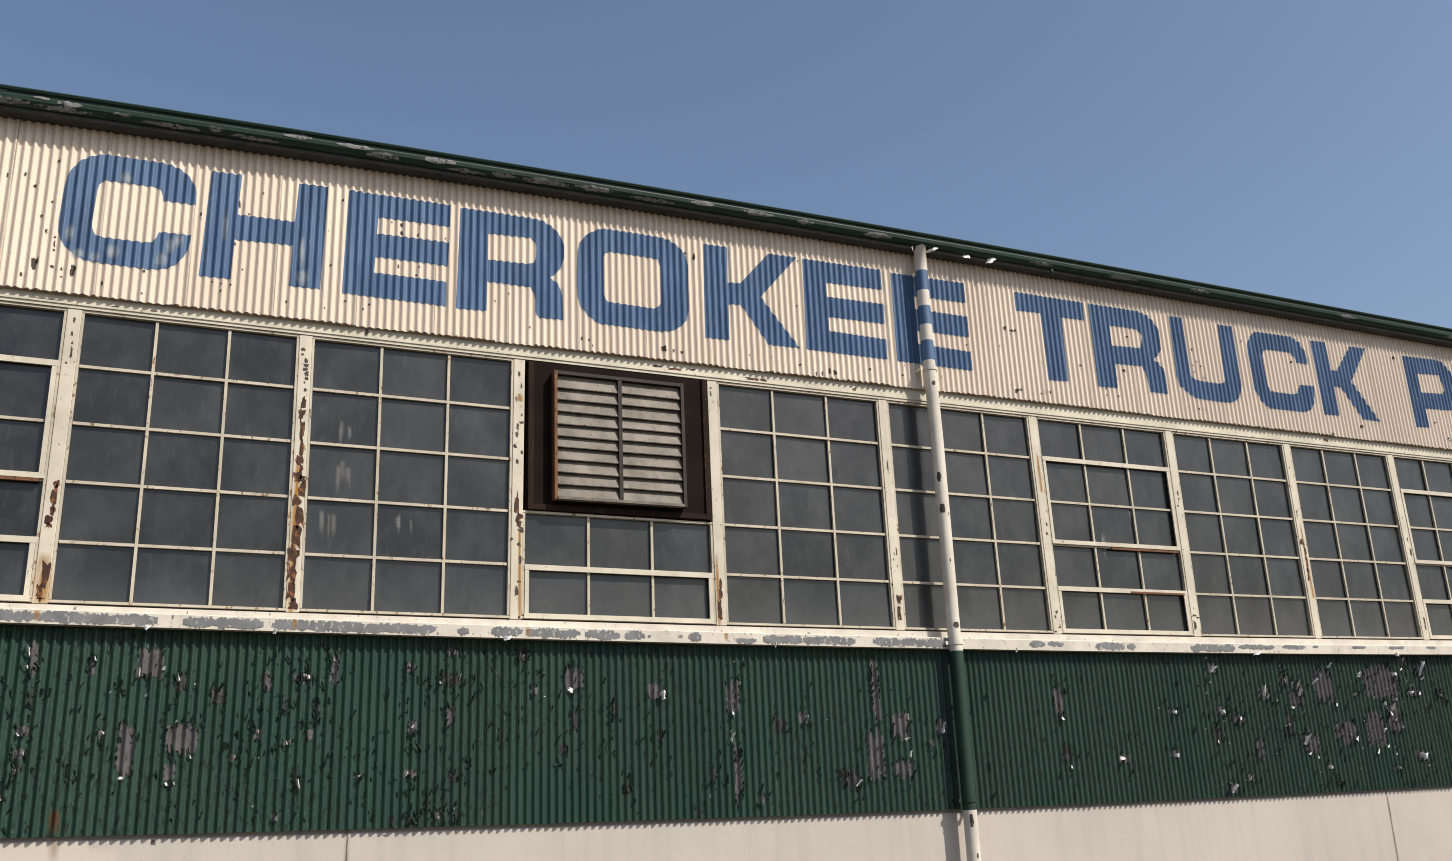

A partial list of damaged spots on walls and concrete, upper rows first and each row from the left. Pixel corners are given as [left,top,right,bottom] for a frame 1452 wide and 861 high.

corrosion [44,480,60,527]
corrosion [286,396,307,627]
corrosion [36,561,51,617]
peeling [0,609,227,708]
peeling [183,616,436,635]
peeling [491,615,651,662]
peeling [737,634,855,647]
peeling [97,721,136,780]
peeling [163,720,198,786]
peeling [725,660,745,805]
peeling [841,622,959,791]
peeling [1191,614,1443,771]